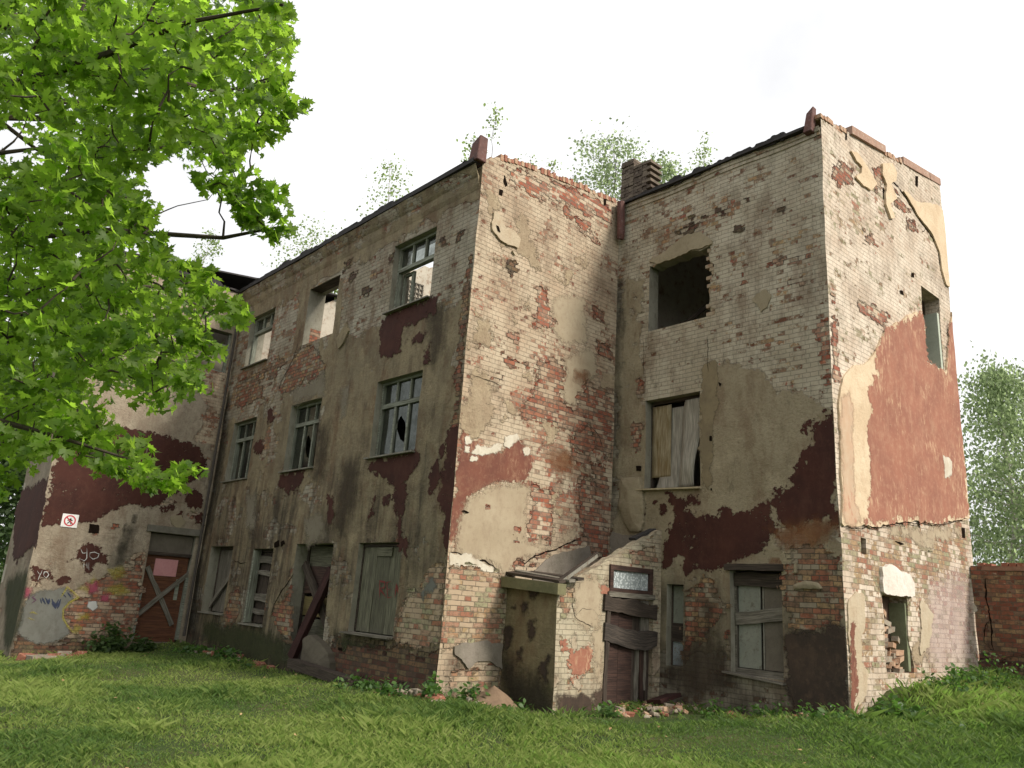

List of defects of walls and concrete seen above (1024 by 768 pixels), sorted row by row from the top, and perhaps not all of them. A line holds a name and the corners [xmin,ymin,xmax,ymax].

flaking render [490,211,521,278]
spalling [499,166,612,245]
spalling [235,344,326,425]
spalling [331,254,614,714]
peeling [629,289,970,660]
peeling [11,426,208,658]
crack [452,536,584,570]
crack [844,518,967,530]
water stain [4,571,28,649]
crack [984,578,993,647]
water stain [502,659,552,713]
water stain [784,624,849,716]